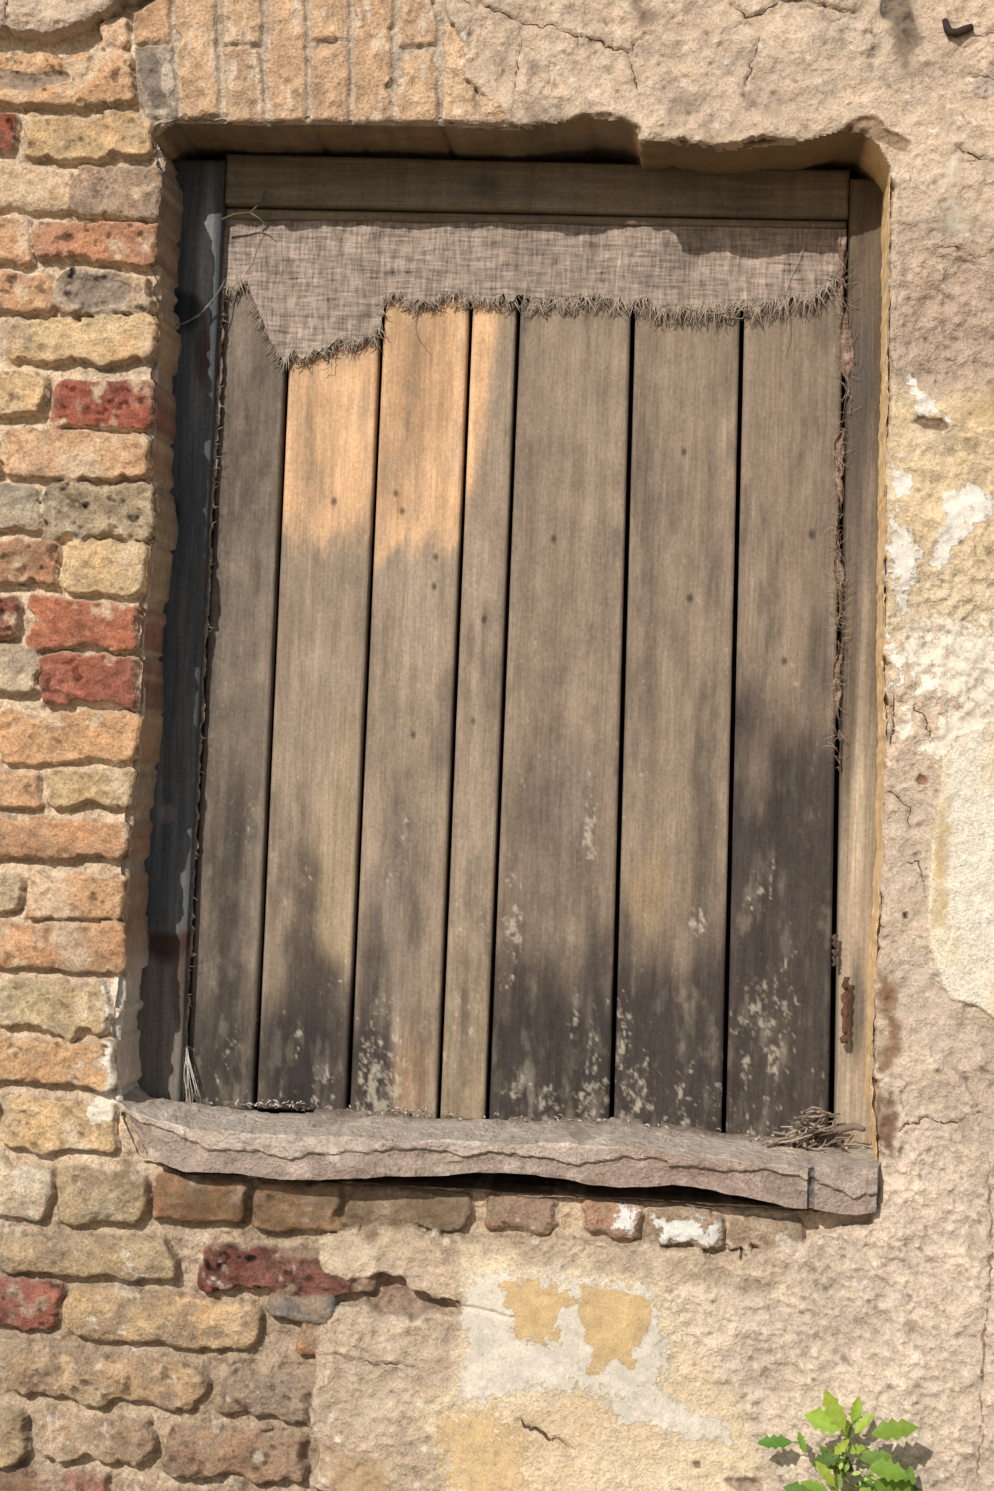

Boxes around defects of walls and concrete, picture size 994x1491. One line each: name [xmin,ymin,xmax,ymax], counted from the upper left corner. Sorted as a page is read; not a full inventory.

crack [464,0,644,91]
crack [731,0,854,88]
peeling [902,373,952,430]
peeling [883,461,994,768]
peeling [346,1261,734,1491]
spalling [724,1477,768,1491]